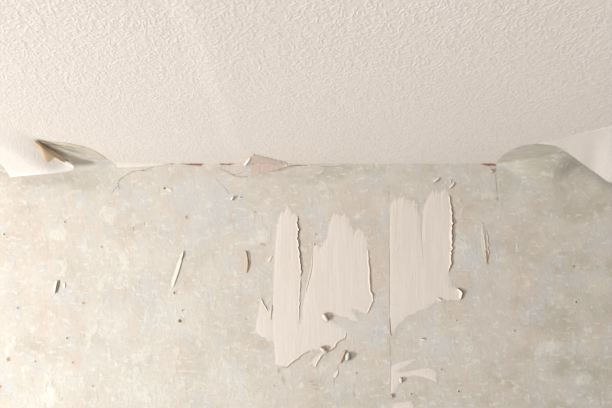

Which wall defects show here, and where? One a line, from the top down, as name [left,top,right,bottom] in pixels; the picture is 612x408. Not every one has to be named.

peeling [0,119,167,177]
peeling [497,126,612,183]
peeling [171,251,184,296]
peeling [254,204,377,381]
peeling [387,177,464,338]
peeling [389,357,443,408]